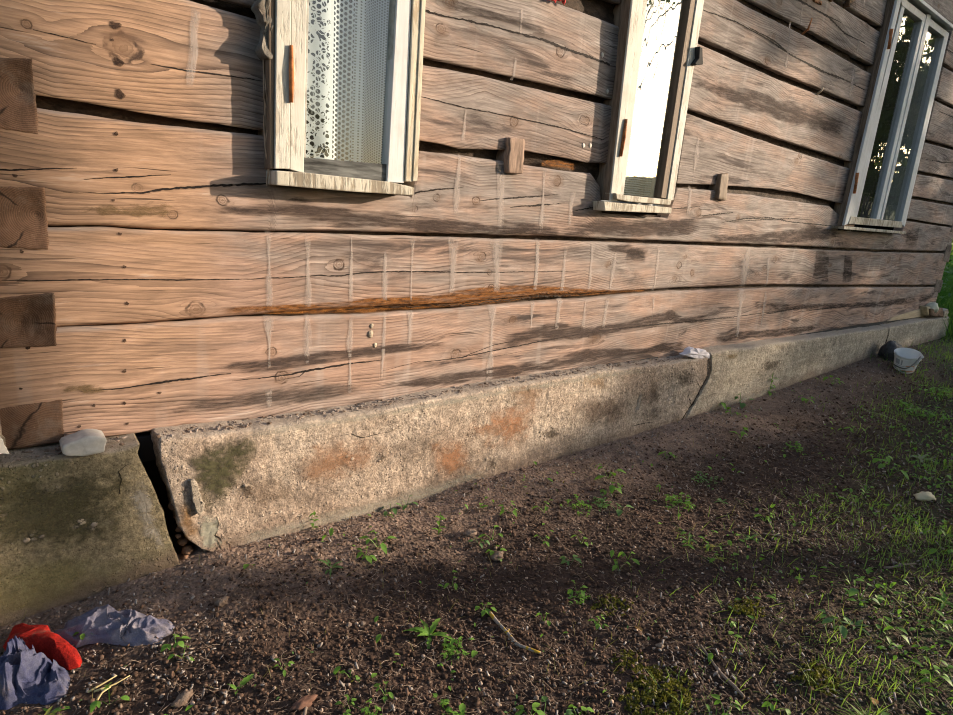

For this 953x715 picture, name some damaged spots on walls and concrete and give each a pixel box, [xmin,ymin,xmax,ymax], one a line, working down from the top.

crack [682,359,710,419]